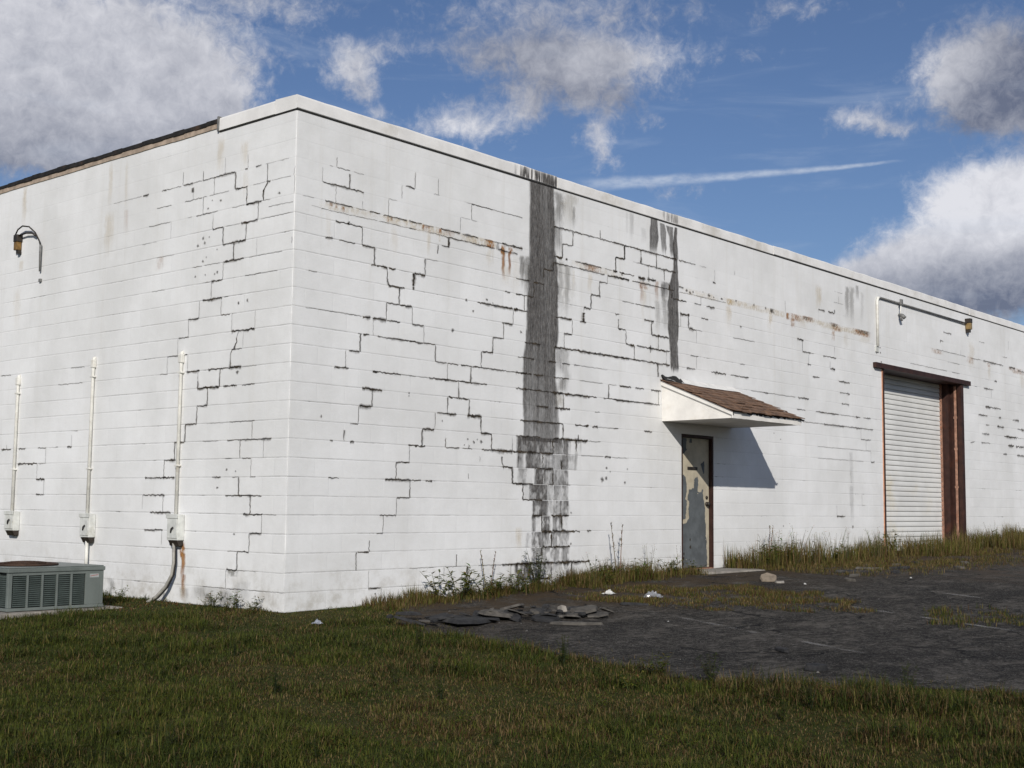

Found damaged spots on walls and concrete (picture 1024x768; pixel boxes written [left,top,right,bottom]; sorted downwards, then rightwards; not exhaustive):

rust [486,240,512,270]
leakage [650,218,679,370]
crack [144,164,295,590]
leakage [515,167,569,582]
crack [319,167,873,580]
crack [972,342,1024,456]
peeling [683,462,707,568]